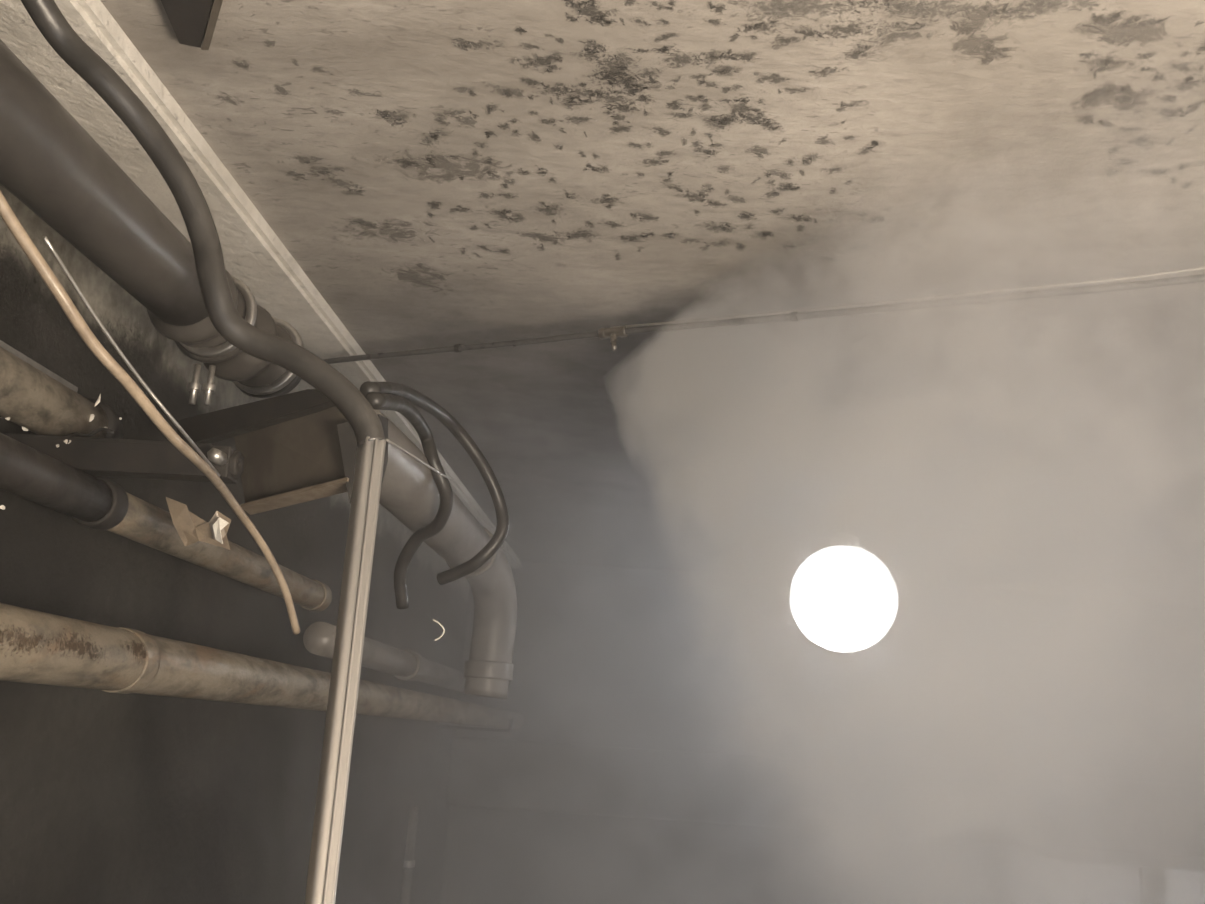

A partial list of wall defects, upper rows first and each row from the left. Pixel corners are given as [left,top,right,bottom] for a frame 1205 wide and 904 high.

water stain [400,0,879,251]
water stain [953,4,1008,62]
water stain [1076,10,1205,189]
water stain [359,201,470,242]